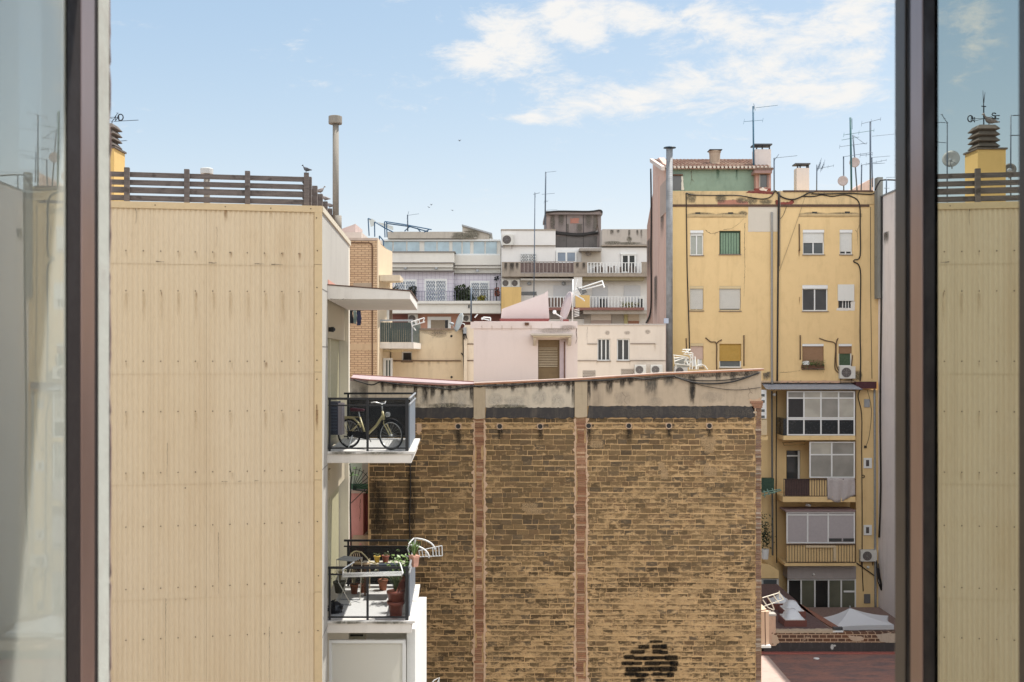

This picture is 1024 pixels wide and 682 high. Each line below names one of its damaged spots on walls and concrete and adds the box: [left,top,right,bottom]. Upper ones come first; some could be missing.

water stain [381,382,473,408]
water stain [487,382,574,394]
water stain [587,371,770,399]